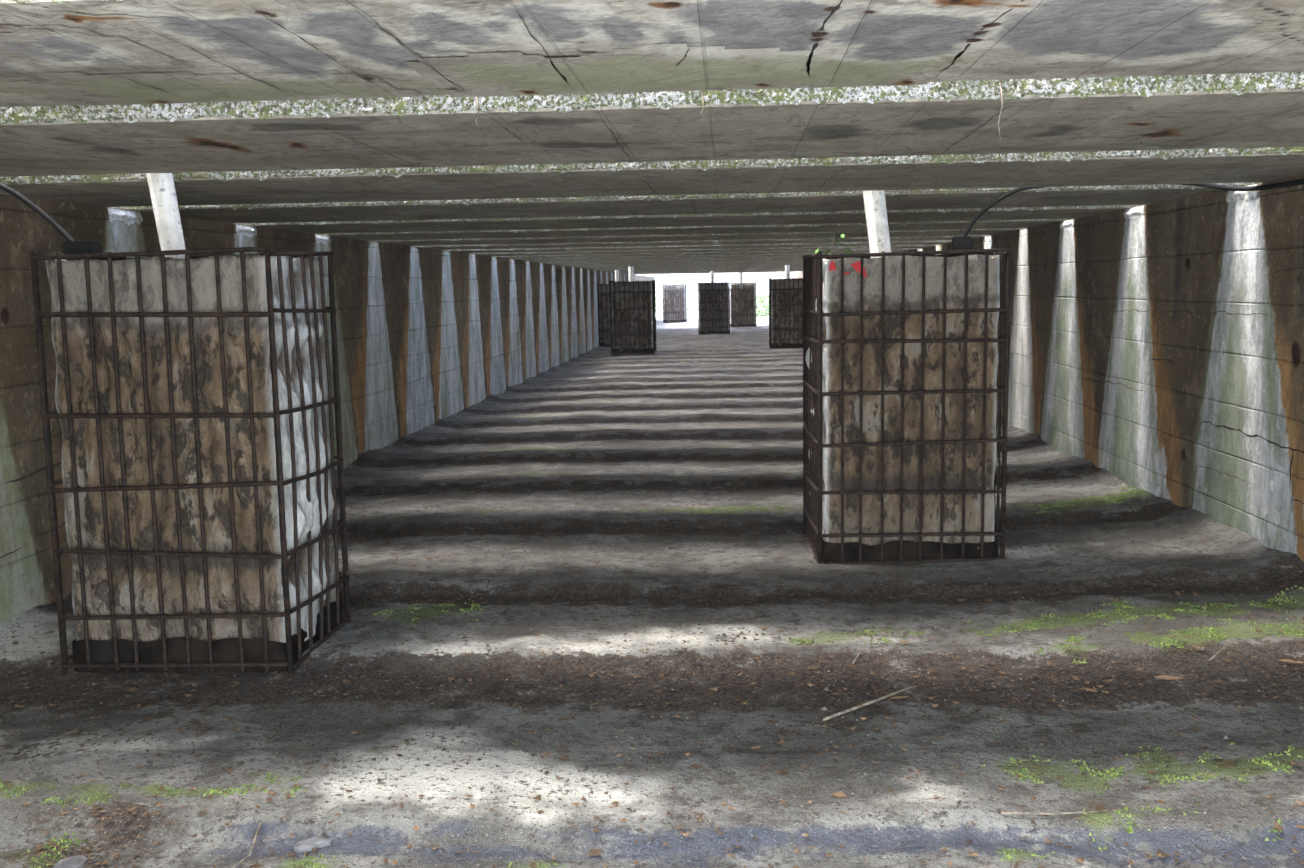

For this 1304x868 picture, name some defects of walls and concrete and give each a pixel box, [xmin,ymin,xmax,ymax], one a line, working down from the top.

crack [131,21,294,97]
crack [244,2,392,95]
crack [346,0,464,91]
crack [511,3,572,89]
leakage [0,0,1304,80]
leakage [100,208,151,258]
corrosion [1075,219,1111,473]
corrosion [1146,205,1194,509]
corrosion [1261,183,1304,503]
leakage [0,361,37,623]
crack [1194,420,1304,527]